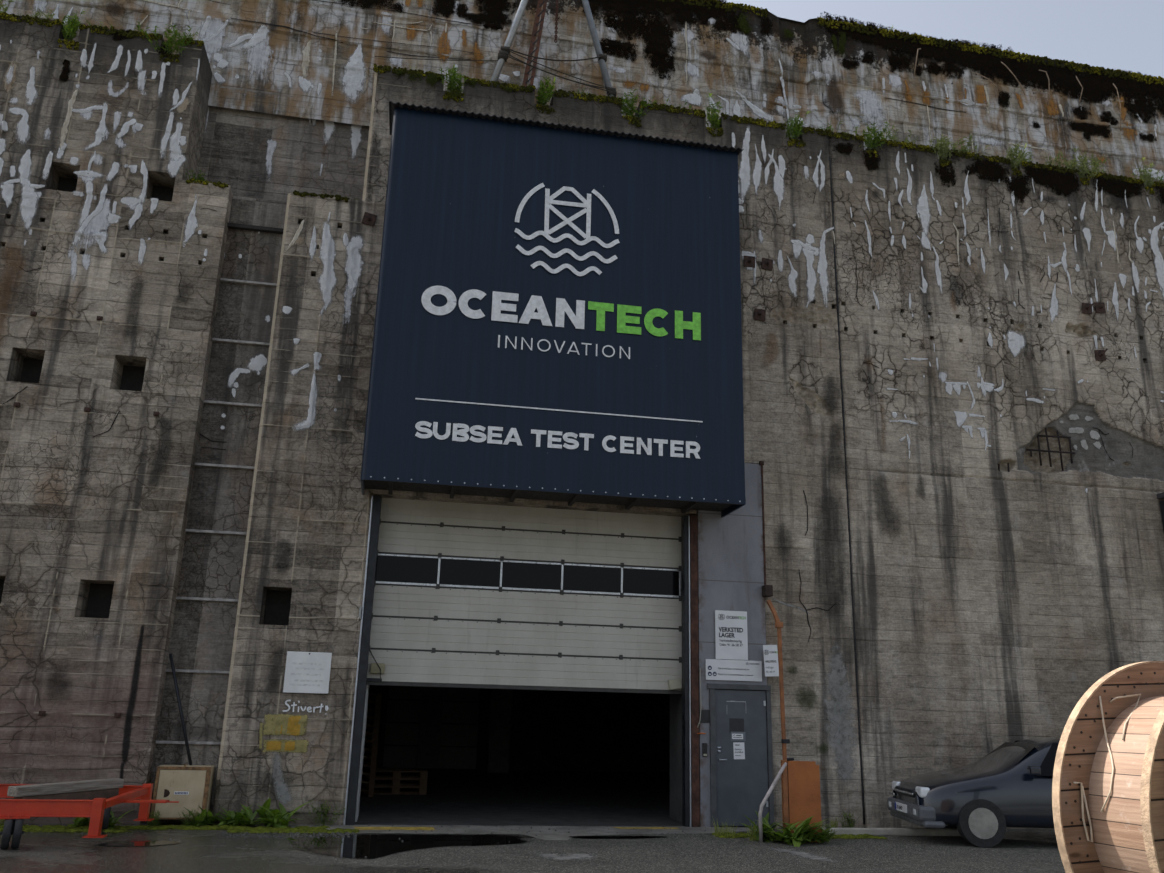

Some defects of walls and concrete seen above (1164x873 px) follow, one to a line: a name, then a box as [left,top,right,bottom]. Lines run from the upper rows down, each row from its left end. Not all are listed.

leakage [0,0,273,279]
corrosion [905,80,932,105]
corrosion [944,84,990,113]
corrosion [1102,96,1157,140]
leakage [286,212,364,320]
leakage [850,151,943,317]
crack [969,191,1009,237]
crack [995,270,1058,309]
leakage [1032,181,1164,323]
spalling [997,403,1164,481]
crack [1093,427,1133,461]
crack [773,570,836,642]